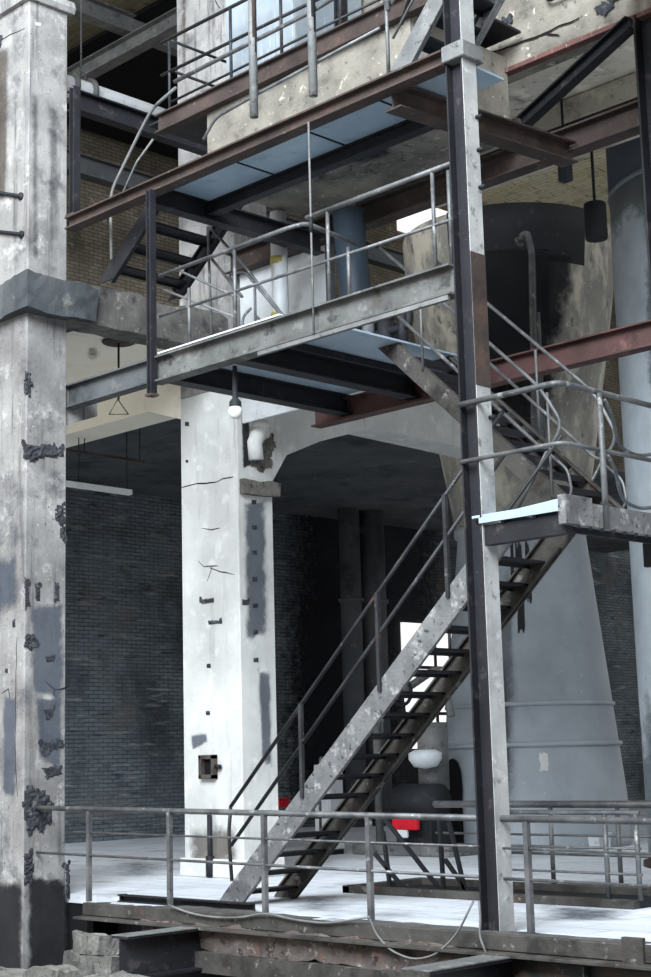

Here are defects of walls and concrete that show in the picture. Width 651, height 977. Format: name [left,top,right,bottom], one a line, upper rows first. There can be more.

crack [492,17,579,52]
spalling [21,439,65,462]
spalling [250,433,276,473]
crack [180,476,233,489]
crack [198,561,235,581]
spalling [22,738,65,885]